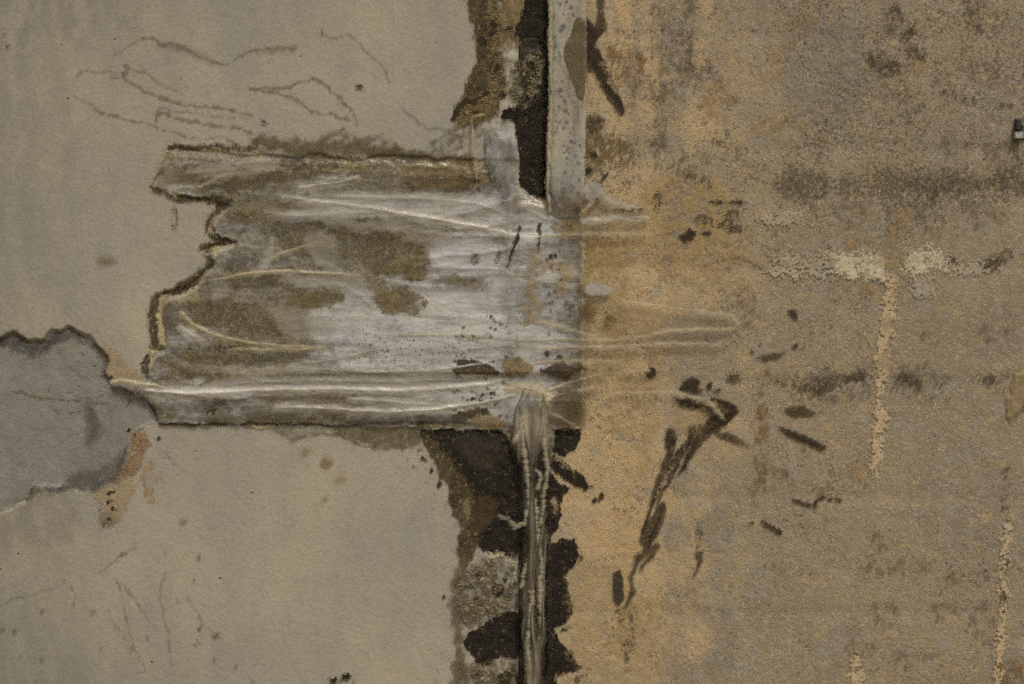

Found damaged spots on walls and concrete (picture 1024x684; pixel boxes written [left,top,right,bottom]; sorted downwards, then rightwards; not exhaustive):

damp [584,122,636,181]
damp [755,207,811,229]
peeling [0,142,524,523]
damp [704,243,1014,478]
damp [624,444,684,608]
damp [443,558,467,684]